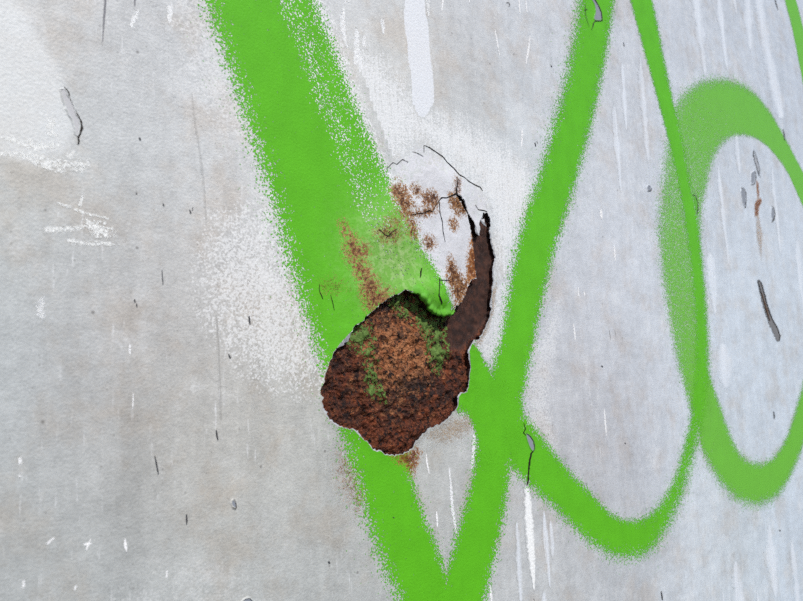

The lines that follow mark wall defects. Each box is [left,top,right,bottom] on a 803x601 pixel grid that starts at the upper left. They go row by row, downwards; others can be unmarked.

peeling [584,0,603,29]
peeling [0,0,85,176]
peeling [277,0,543,368]
crack [388,145,487,242]
rust [318,172,498,479]
spalling [758,280,781,341]
crack [523,424,534,485]
peeling [74,533,336,601]